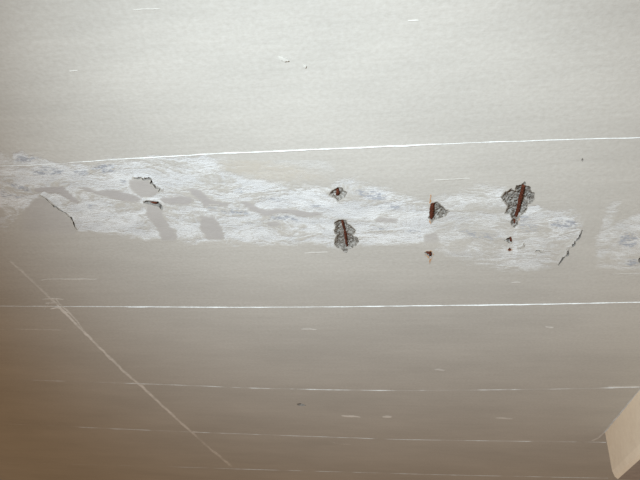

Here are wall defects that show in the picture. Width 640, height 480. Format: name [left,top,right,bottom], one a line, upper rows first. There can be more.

peeling [33,173,230,244]
leakage [0,147,640,279]
spalling [329,187,348,201]
spalling [334,219,359,253]
spalling [422,194,450,264]
spalling [501,182,535,228]